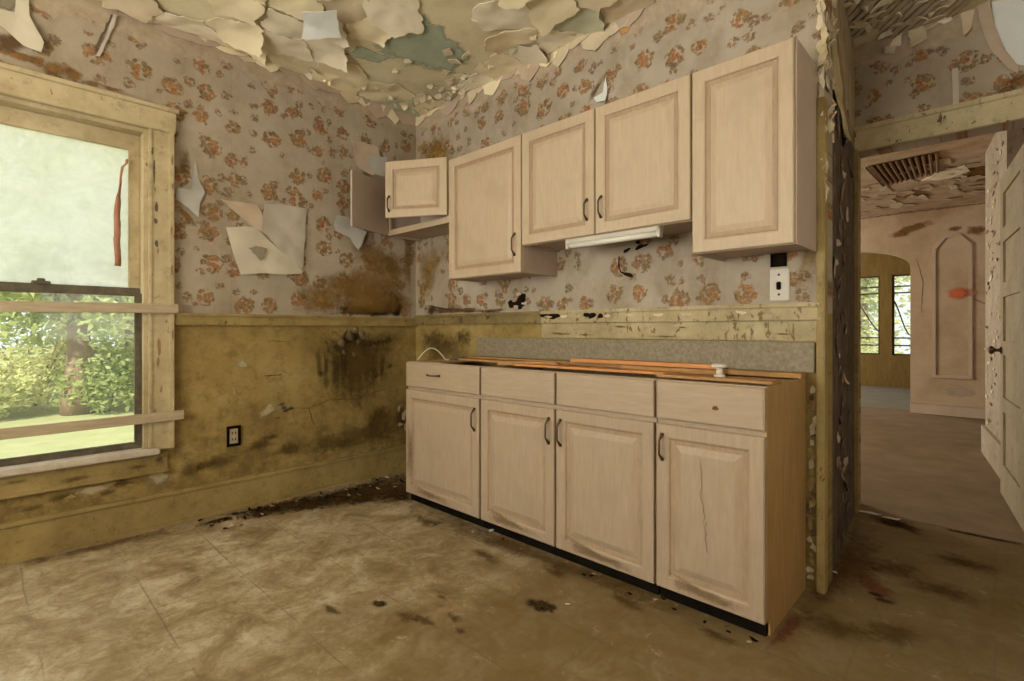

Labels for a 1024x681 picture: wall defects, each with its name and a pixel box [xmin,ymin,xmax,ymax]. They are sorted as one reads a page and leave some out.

peeling [102,0,661,126]
leakage [302,242,439,315]
spalling [508,292,527,310]
peeling [540,313,636,327]
flaking render [811,0,956,547]
peeling [861,141,1004,297]